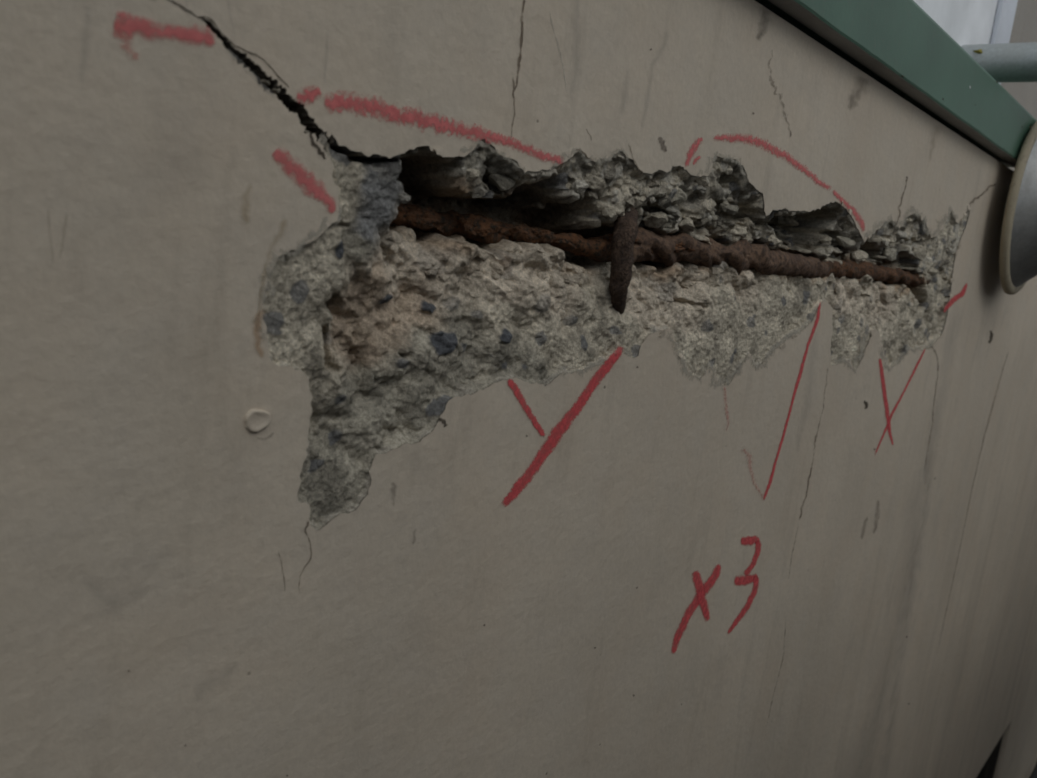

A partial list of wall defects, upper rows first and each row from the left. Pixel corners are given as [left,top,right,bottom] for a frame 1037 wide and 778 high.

crack [169,0,334,159]
crack [512,0,525,126]
spalling [257,132,970,531]